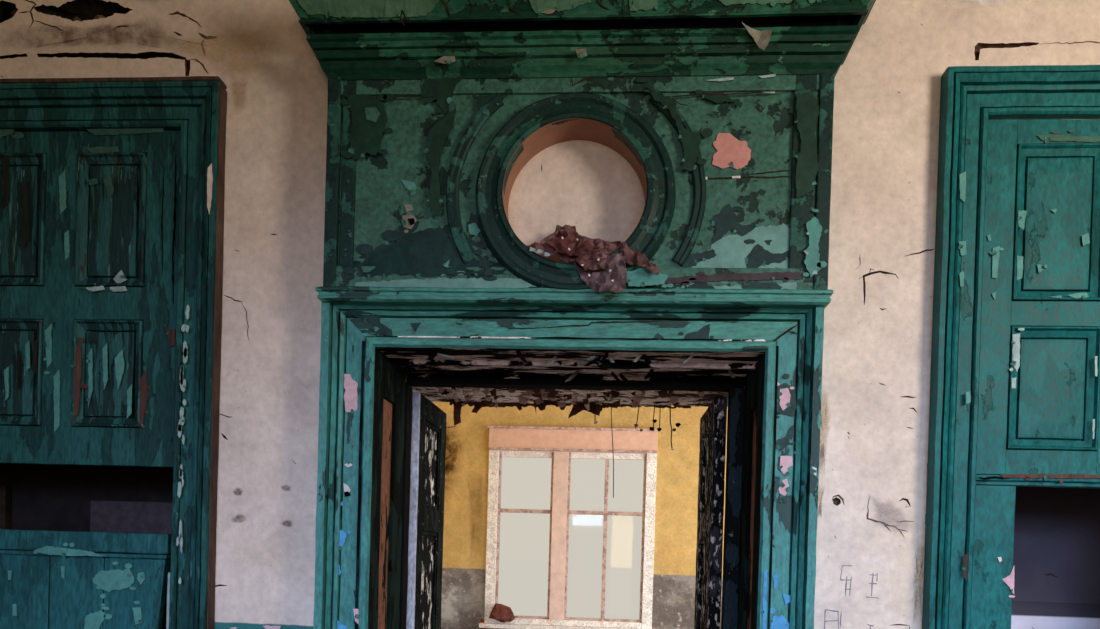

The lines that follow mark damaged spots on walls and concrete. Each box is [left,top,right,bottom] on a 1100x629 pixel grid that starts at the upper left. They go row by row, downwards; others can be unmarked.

flaking render [0,0,18,23]
flaking render [34,0,133,22]
peeling [636,77,751,180]
peeling [341,79,539,295]
peeling [626,204,827,298]
crack [855,249,934,310]
peeling [344,374,358,414]
peeling [406,350,736,431]
peeling [1009,328,1025,388]
peeling [776,373,797,504]
crack [832,494,926,537]
peeling [33,543,146,629]